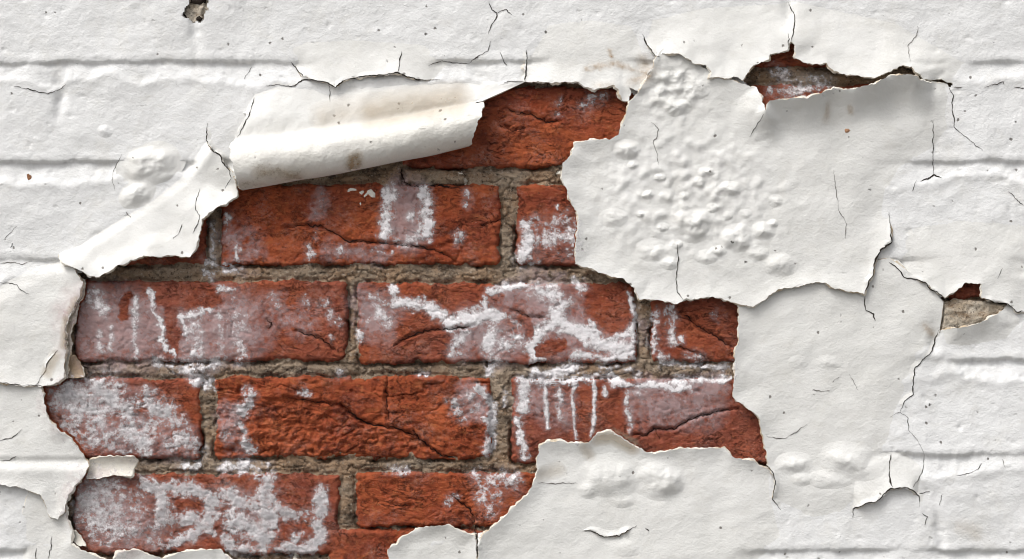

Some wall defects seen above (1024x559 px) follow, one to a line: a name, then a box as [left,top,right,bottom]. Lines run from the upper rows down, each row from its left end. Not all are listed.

crack [206,4,527,188]
crack [912,87,979,191]
efflorescence [49,371,328,559]
peeling [0,20,652,559]
efflorescence [369,281,736,461]
peeling [387,1,1024,559]
crack [769,468,781,510]
crack [850,330,942,524]
crack [863,216,944,319]